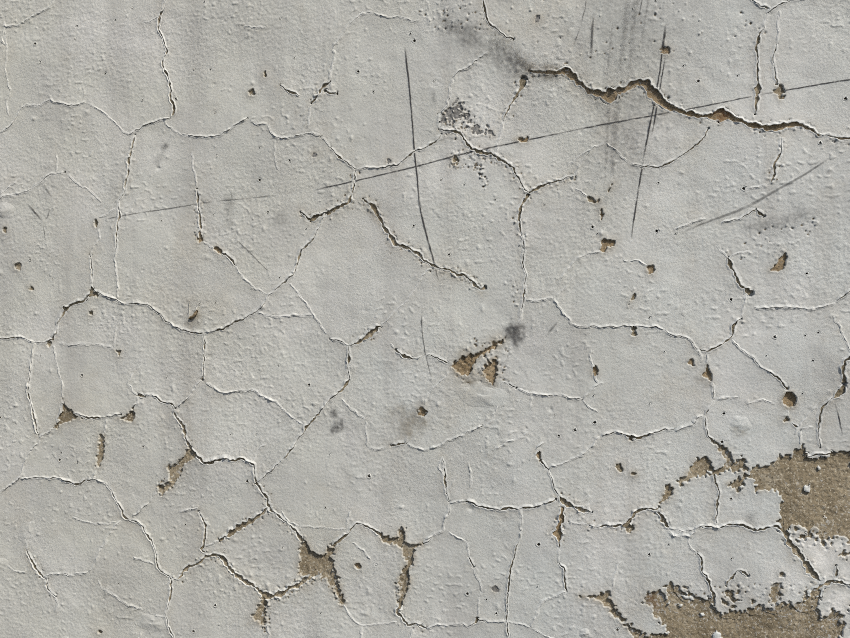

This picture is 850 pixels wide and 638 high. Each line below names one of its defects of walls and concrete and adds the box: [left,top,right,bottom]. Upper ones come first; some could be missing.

crack [436,0,850,324]
crack [0,0,486,638]
spalling [452,337,506,385]
crack [693,245,850,459]
spalling [54,403,83,429]
spalling [158,445,204,496]
crack [393,382,850,638]
peeling [655,438,850,560]
spalling [298,539,345,604]
spalling [380,527,421,605]
peeling [579,572,850,638]